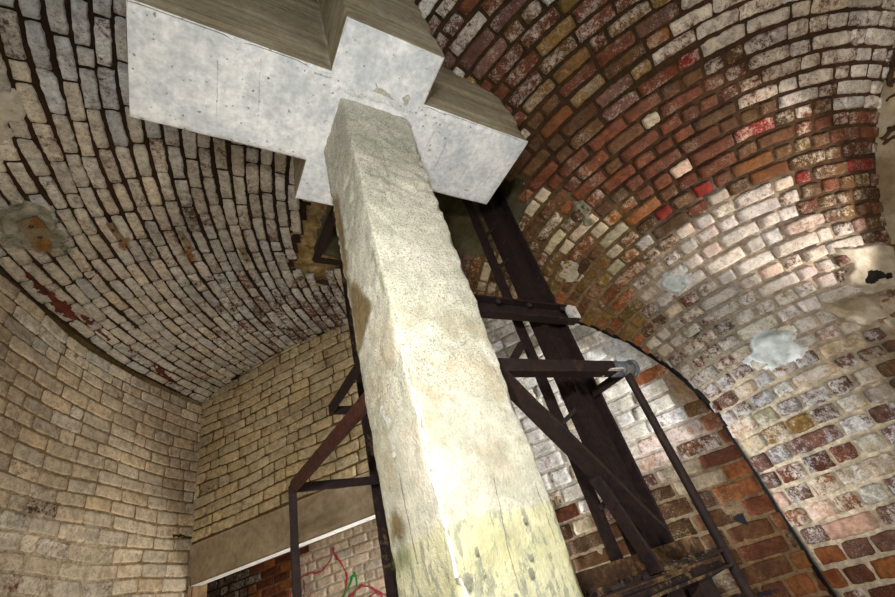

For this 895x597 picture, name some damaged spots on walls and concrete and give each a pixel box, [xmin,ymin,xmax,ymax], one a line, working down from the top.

crack [885,48,895,102]
crack [879,125,895,145]
leakage [661,265,692,296]
flaking render [865,270,893,284]
peeling [25,271,114,341]
peeling [152,364,177,382]